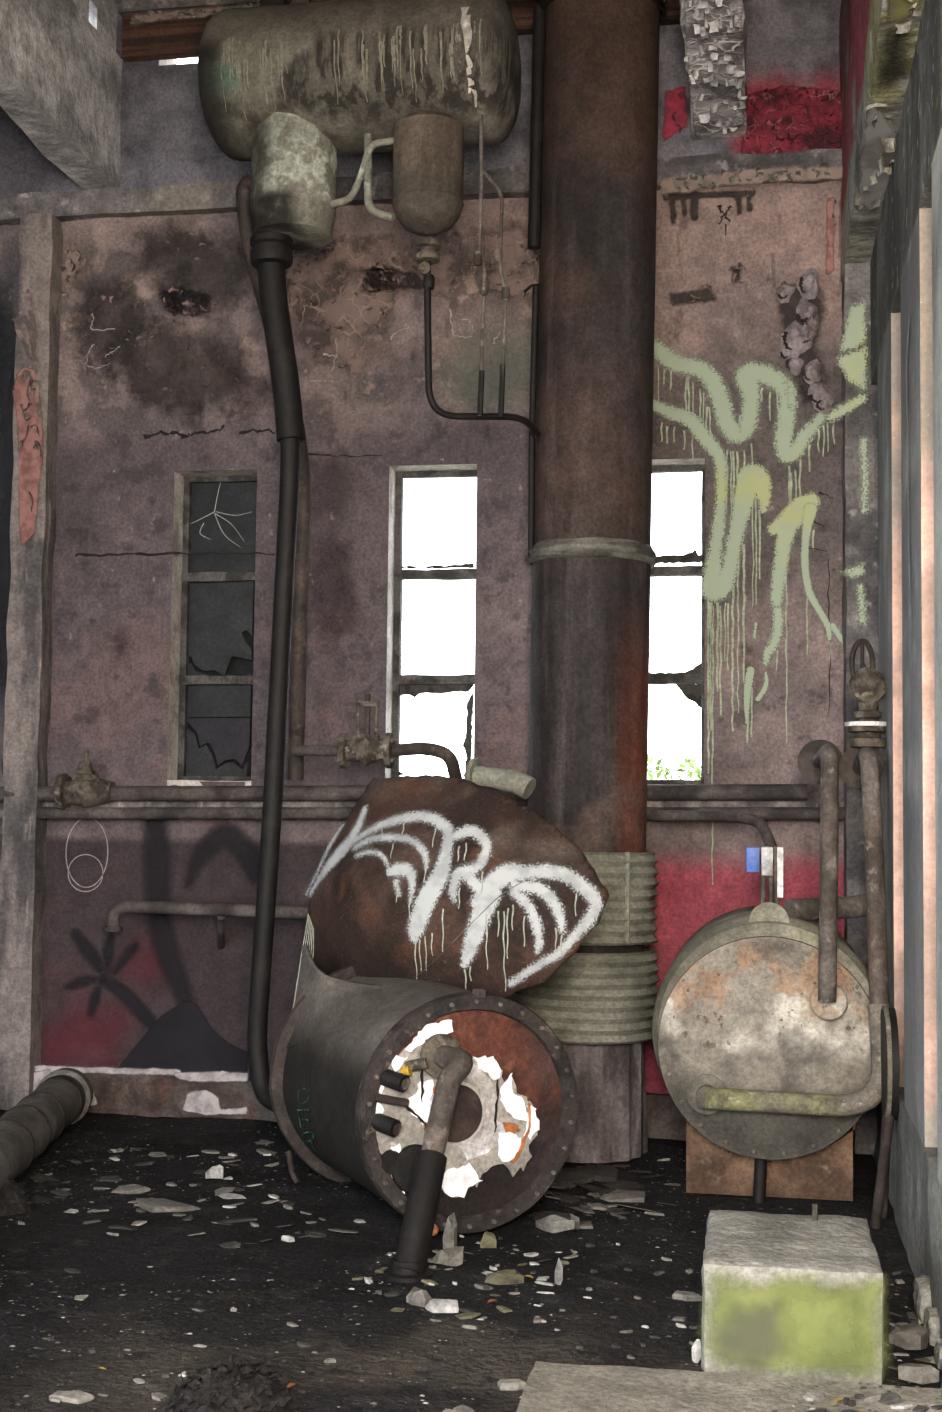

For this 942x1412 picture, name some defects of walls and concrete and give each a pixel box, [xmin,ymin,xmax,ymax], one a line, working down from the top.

spalling [887,0,922,34]
peeling [660,0,843,224]
spalling [825,94,897,274]
peeling [11,289,43,544]
crack [142,425,276,440]
crack [308,451,383,459]